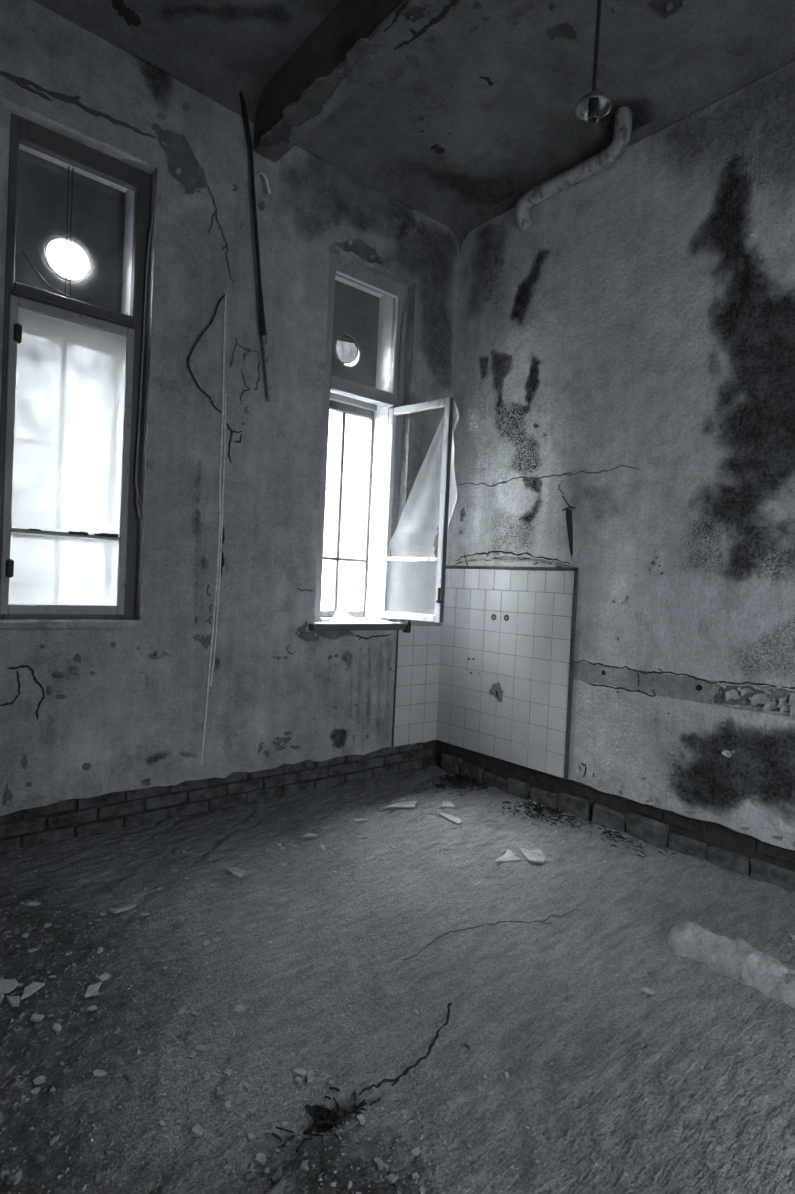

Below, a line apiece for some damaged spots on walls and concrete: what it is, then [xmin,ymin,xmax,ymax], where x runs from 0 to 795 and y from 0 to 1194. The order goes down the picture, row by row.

peeling [644,0,689,20]
crack [0,71,160,138]
peeling [149,112,208,197]
leakage [512,252,547,324]
leakage [669,70,795,580]
crack [226,337,260,463]
leakage [480,353,541,555]
crack [458,465,639,494]
crack [0,665,45,720]
peeling [695,682,795,731]
leakage [666,722,795,813]
crack [359,1002,452,1095]